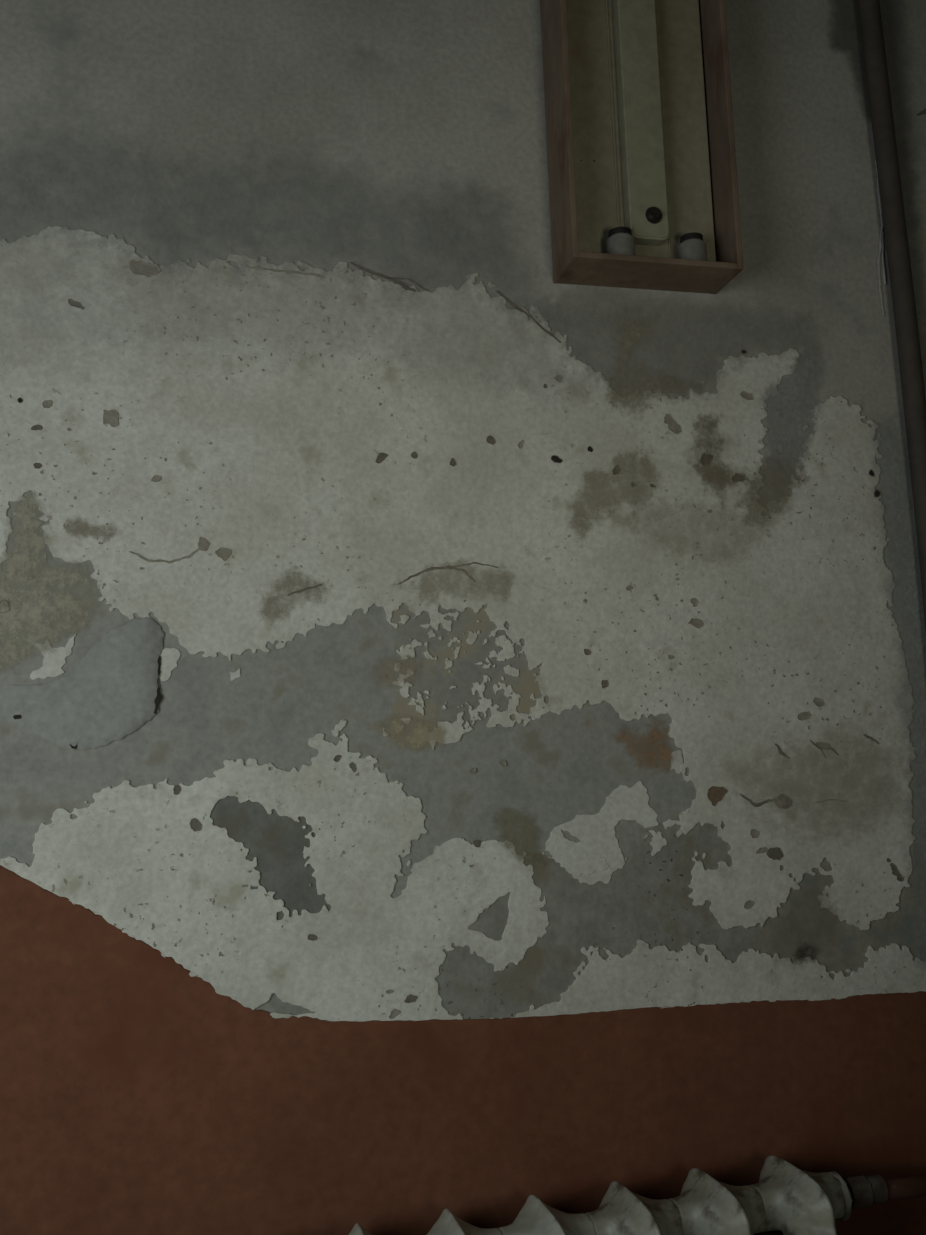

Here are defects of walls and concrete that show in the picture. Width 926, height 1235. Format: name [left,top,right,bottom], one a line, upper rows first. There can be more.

leakage [695,416,799,519]
crack [397,562,498,585]
peeling [0,226,926,1022]